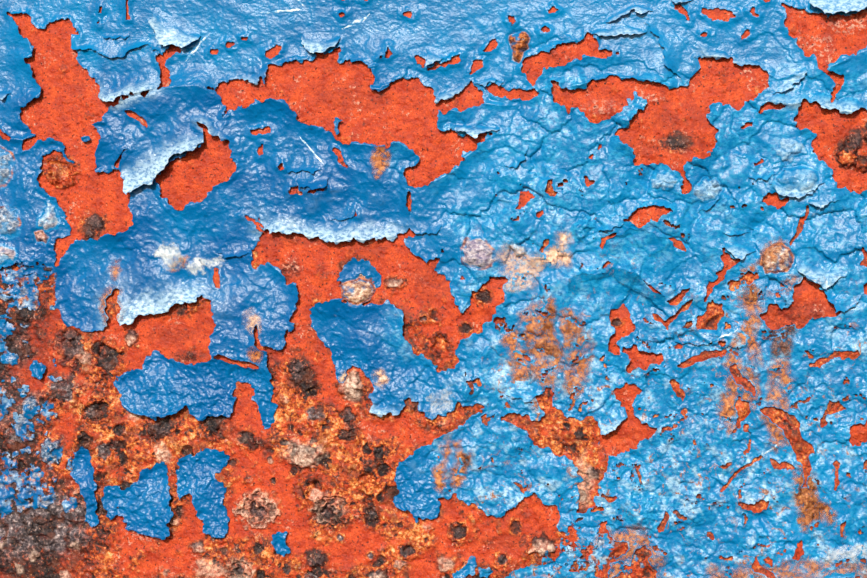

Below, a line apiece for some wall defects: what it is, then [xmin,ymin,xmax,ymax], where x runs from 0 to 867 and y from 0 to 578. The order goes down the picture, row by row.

peeling [0,0,867,456]
crack [642,280,693,330]
crack [677,350,730,368]
rust [668,241,811,433]
rust [804,349,860,368]
rust [0,261,240,578]
peeling [47,364,390,578]
rust [174,283,667,578]
crack [720,455,763,492]
crack [732,396,846,488]
rust [761,416,834,531]
peeling [406,485,560,578]